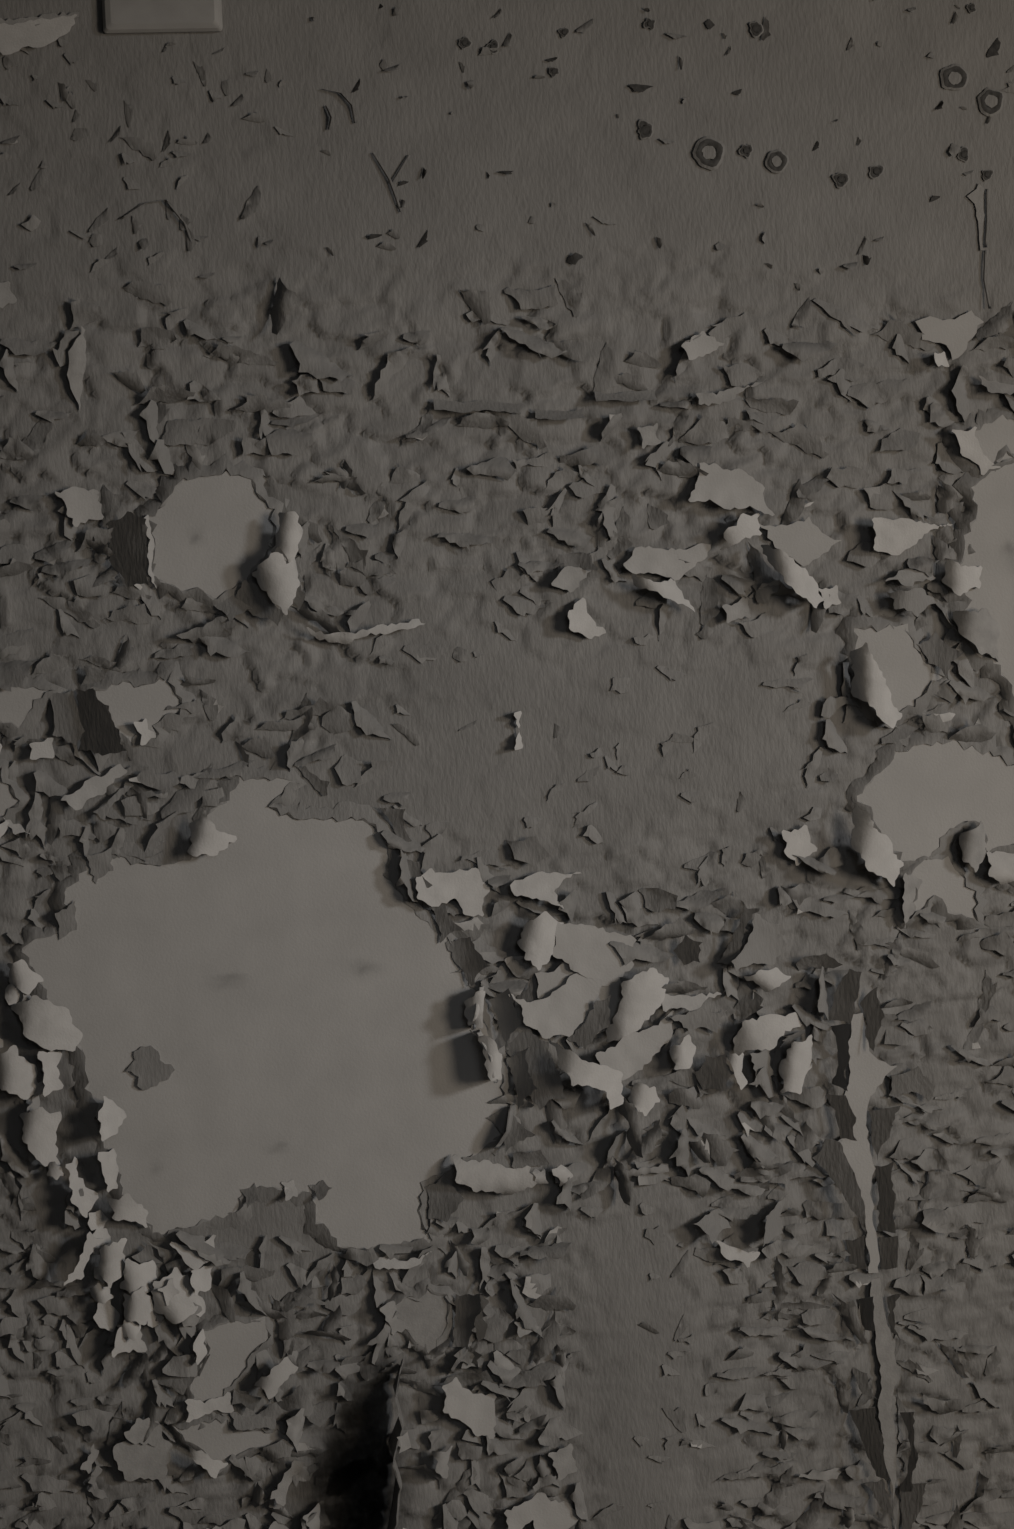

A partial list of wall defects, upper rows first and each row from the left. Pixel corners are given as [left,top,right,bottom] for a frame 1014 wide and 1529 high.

peeling [0,12,84,70]
peeling [629,84,654,92]
peeling [987,38,1014,93]
peeling [110,101,212,251]
peeling [567,252,583,265]
peeling [843,237,884,270]
peeling [122,281,279,366]
peeling [270,278,297,335]
peeling [0,297,102,461]
peeling [359,330,450,401]
peeling [0,341,849,1529]
crack [684,881,1014,1529]